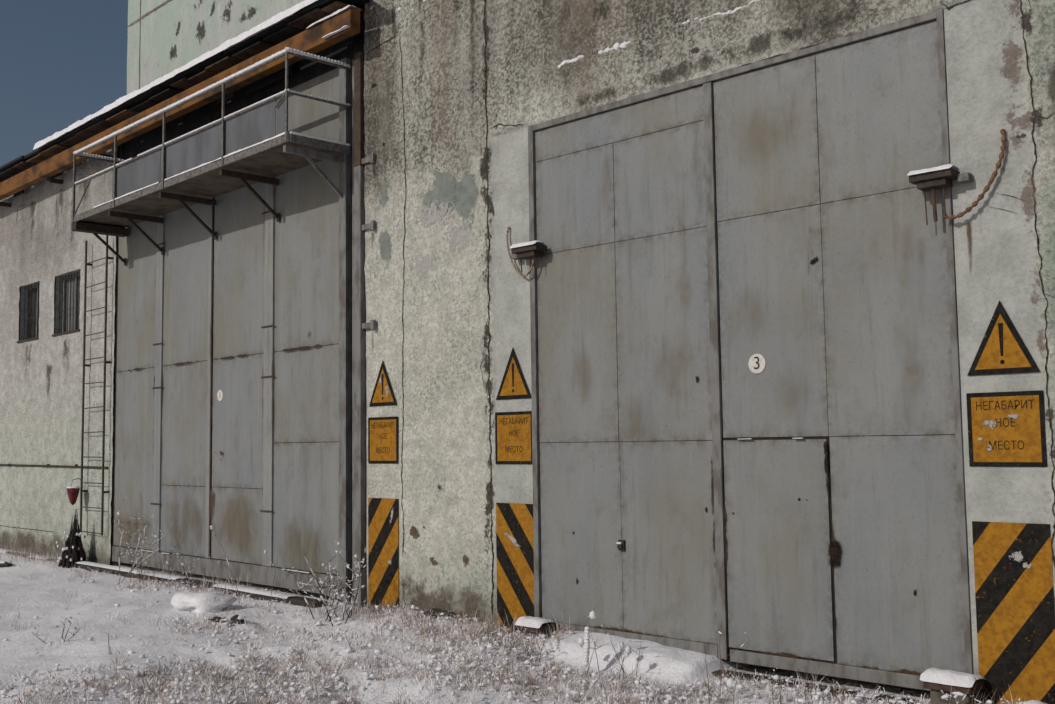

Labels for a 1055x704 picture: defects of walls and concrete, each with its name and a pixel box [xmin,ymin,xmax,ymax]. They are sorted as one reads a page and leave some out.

peeling [194,0,258,43]
water stain [471,0,490,100]
water stain [653,56,707,83]
water stain [728,33,770,58]
water stain [480,145,494,297]
crack [365,35,406,554]
crack [480,0,524,618]
crack [988,0,1055,567]
water stain [482,319,494,439]
water stain [484,482,494,567]